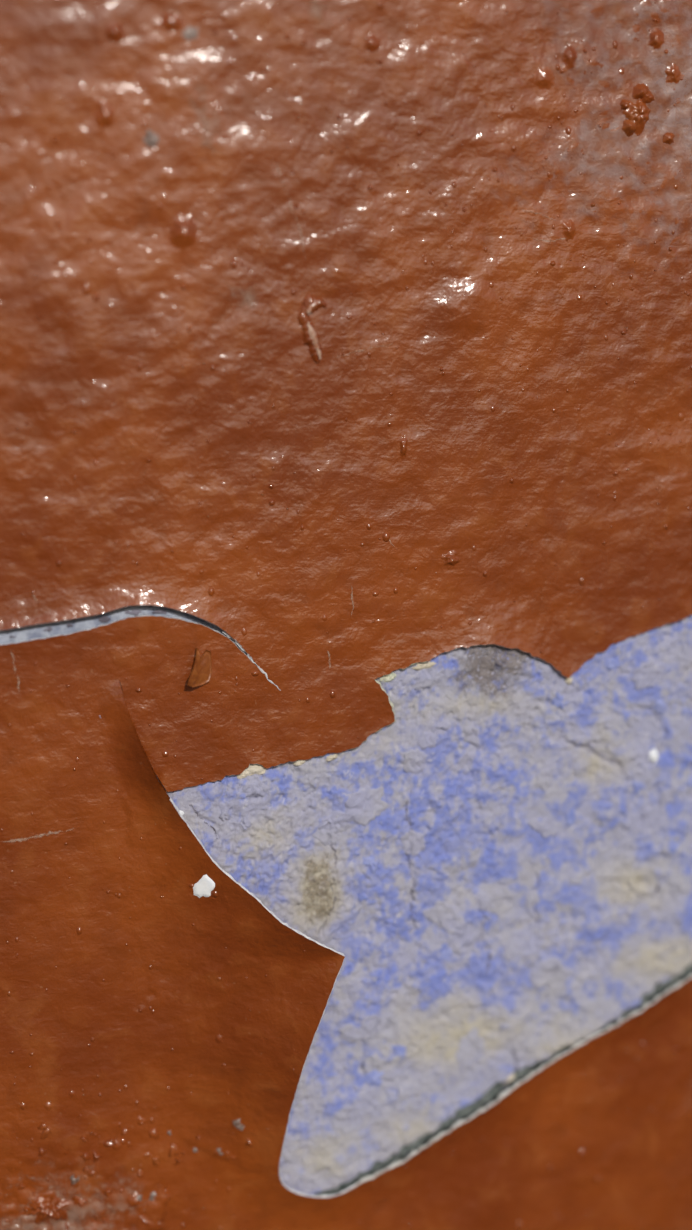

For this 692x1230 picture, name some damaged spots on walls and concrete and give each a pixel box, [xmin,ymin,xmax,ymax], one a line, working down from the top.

crack [0,605,281,691]
peeling [18,614,692,1230]